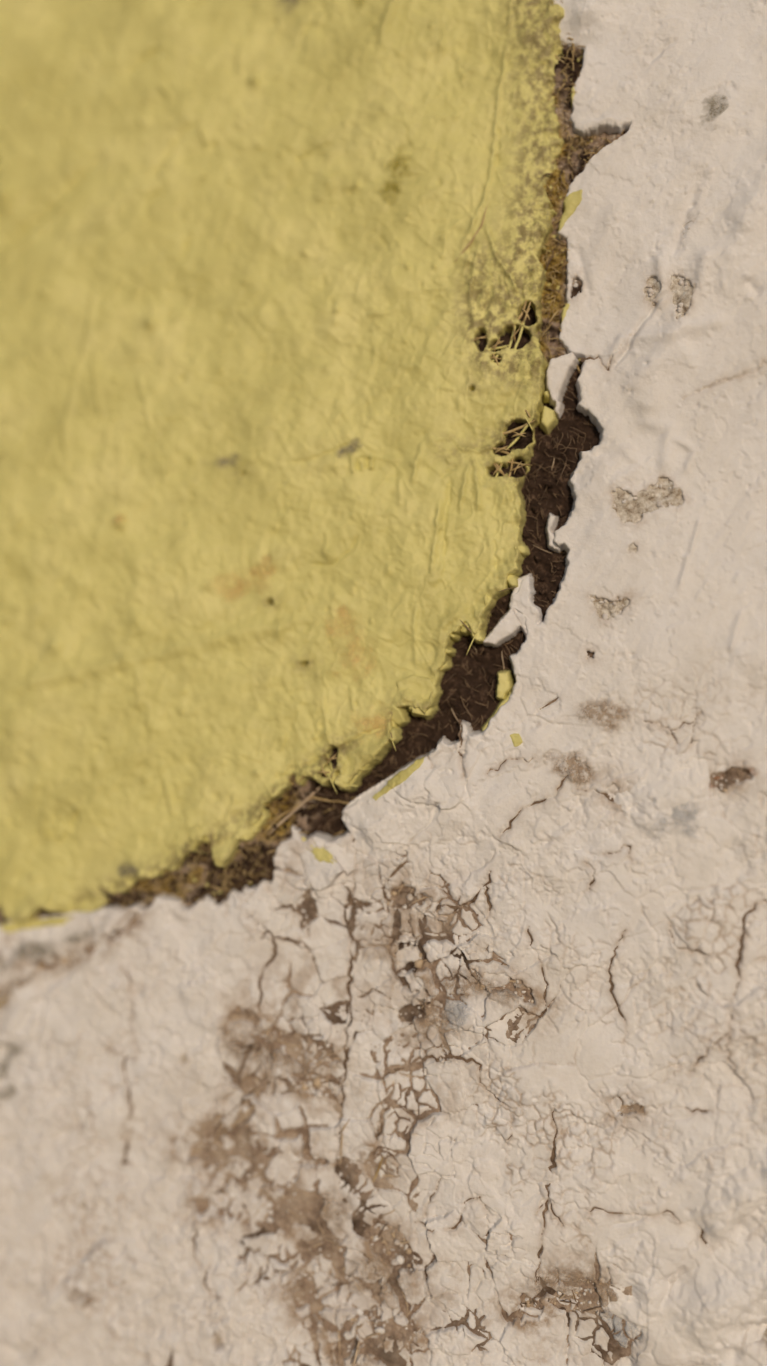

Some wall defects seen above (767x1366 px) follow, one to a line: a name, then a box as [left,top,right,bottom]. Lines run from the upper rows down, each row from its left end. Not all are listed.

peeling [37,33,630,970]
spalling [612,477,684,523]
peeling [0,901,73,933]
flaking render [390,936,432,1025]
flaking render [469,962,534,1003]
crack [192,831,707,1366]